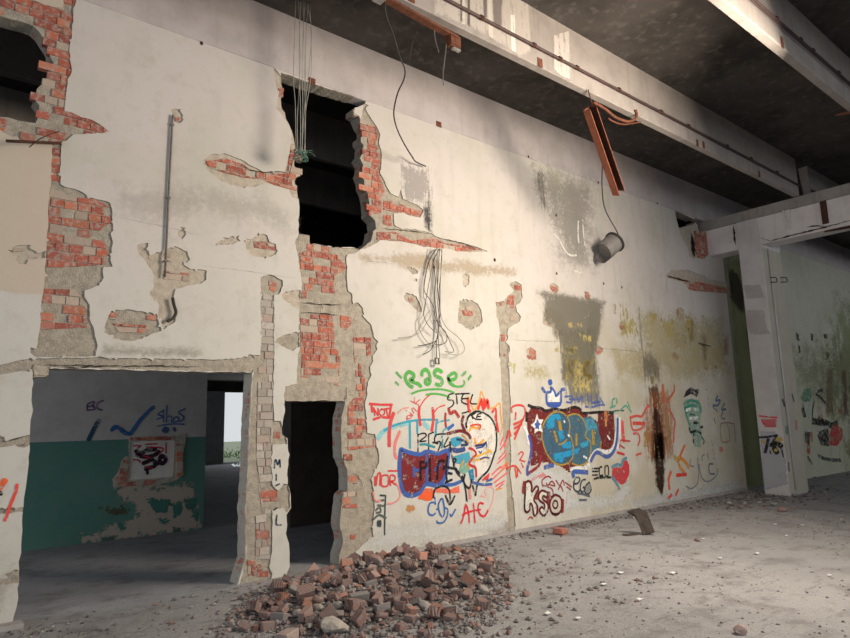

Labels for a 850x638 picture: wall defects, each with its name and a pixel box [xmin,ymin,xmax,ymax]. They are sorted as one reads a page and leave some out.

spalling [0,0,487,586]
leakage [542,293,603,404]
spalling [667,270,728,294]
crack [762,220,850,242]
spalling [495,282,522,531]
spalling [263,582,313,623]